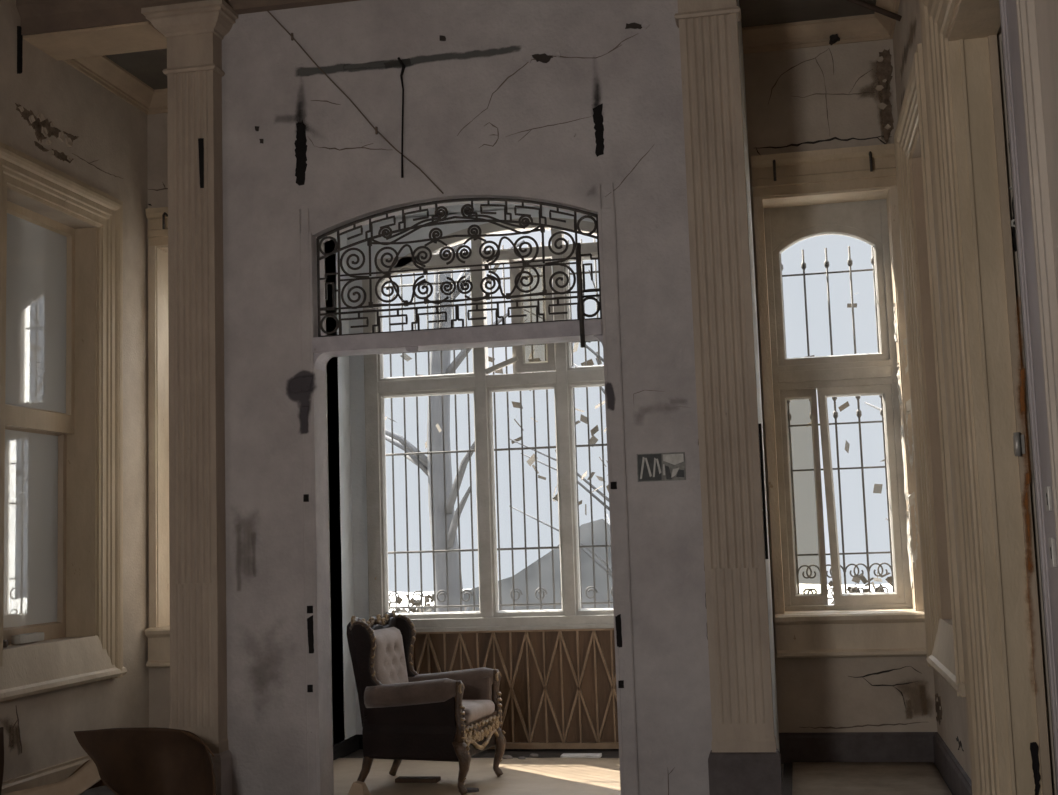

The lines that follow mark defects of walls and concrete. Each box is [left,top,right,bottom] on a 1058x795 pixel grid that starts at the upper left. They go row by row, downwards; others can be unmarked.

peeling [15,103,79,163]
crack [308,137,386,151]
crack [457,34,637,148]
crack [756,49,891,155]
peeling [875,49,894,144]
crack [801,666,922,729]